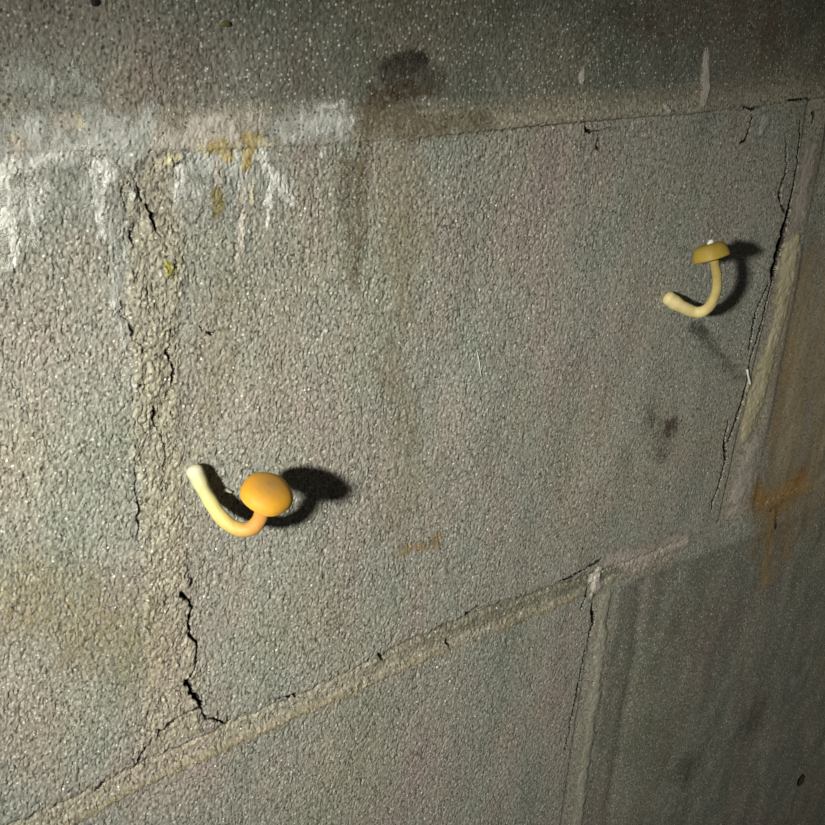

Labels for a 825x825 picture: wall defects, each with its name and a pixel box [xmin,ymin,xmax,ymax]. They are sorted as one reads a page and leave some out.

crack [119,179,175,391]
damp [0,38,498,559]
crack [711,98,815,510]
crack [125,406,167,598]
crack [130,591,246,769]
crack [564,559,601,750]